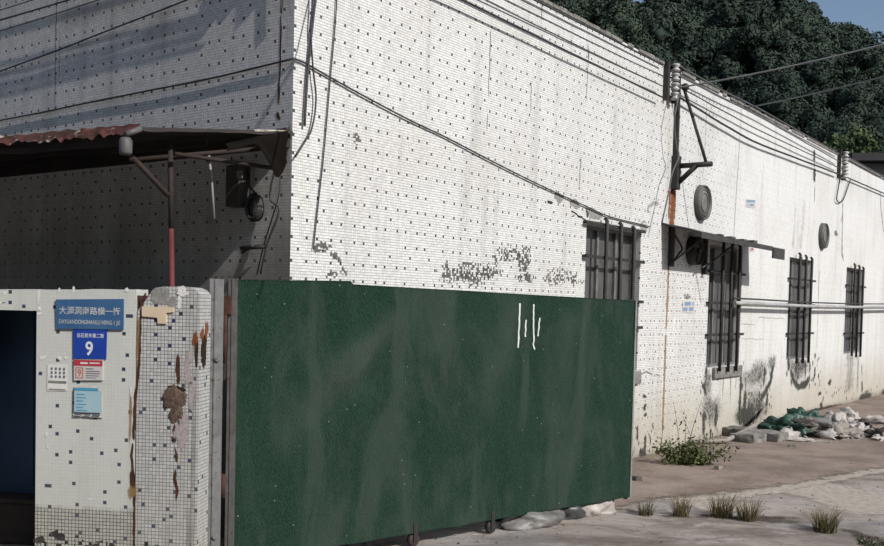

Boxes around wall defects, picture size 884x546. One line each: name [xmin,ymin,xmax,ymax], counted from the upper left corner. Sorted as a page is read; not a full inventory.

peeling [436,245,584,287]
corrosion [192,323,209,368]
spalling [162,384,187,424]
water stain [700,356,776,438]
water stain [786,353,884,413]
peeling [33,529,115,546]